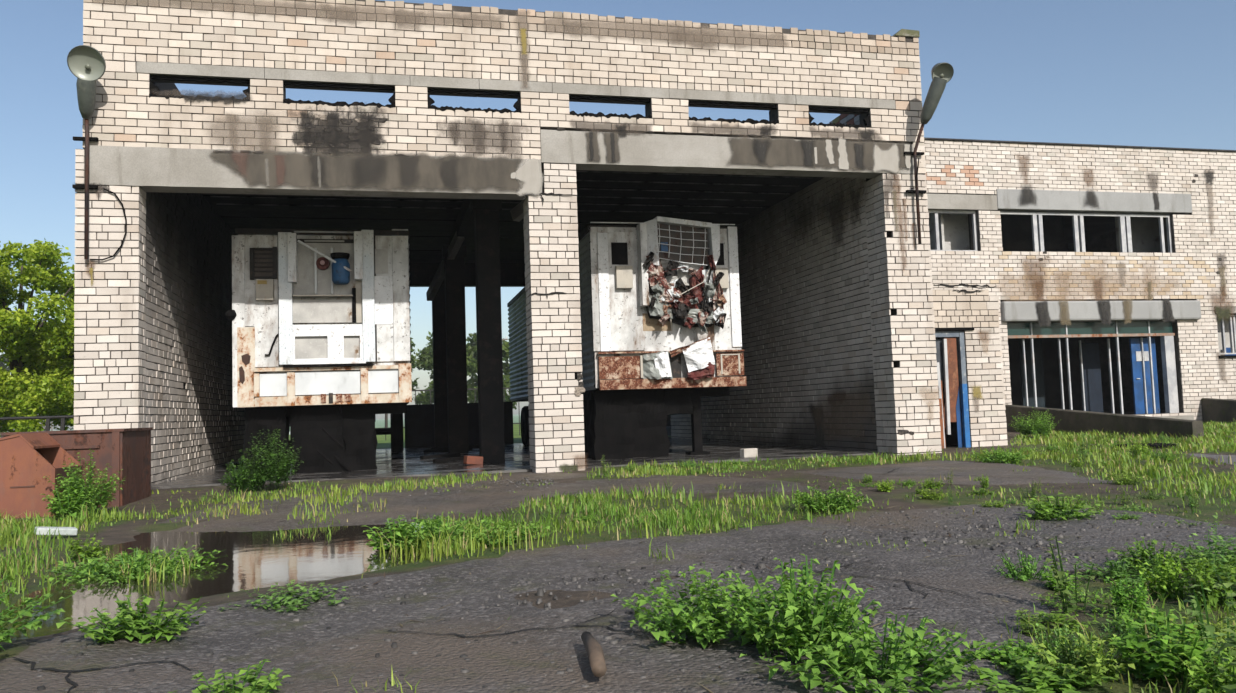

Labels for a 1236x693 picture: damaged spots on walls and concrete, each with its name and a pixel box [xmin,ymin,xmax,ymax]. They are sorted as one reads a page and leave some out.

damp [210,111,522,191]
damp [586,124,627,163]
damp [729,126,911,170]
damp [1036,300,1070,326]
damp [1098,299,1132,325]
damp [1163,299,1175,322]